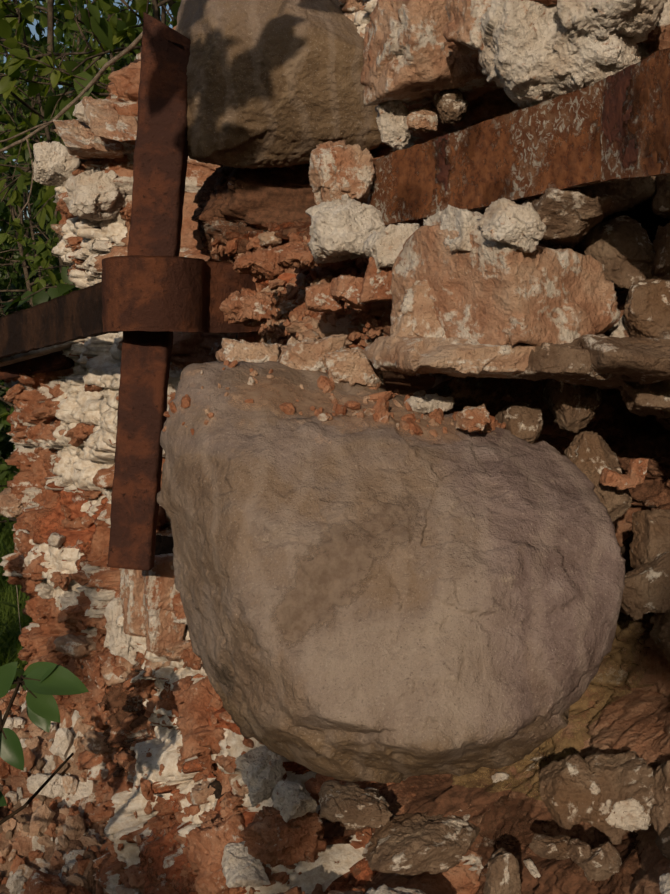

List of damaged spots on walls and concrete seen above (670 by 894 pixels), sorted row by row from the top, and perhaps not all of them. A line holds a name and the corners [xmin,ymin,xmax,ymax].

rust [433,116,523,210]
rust [525,64,641,196]